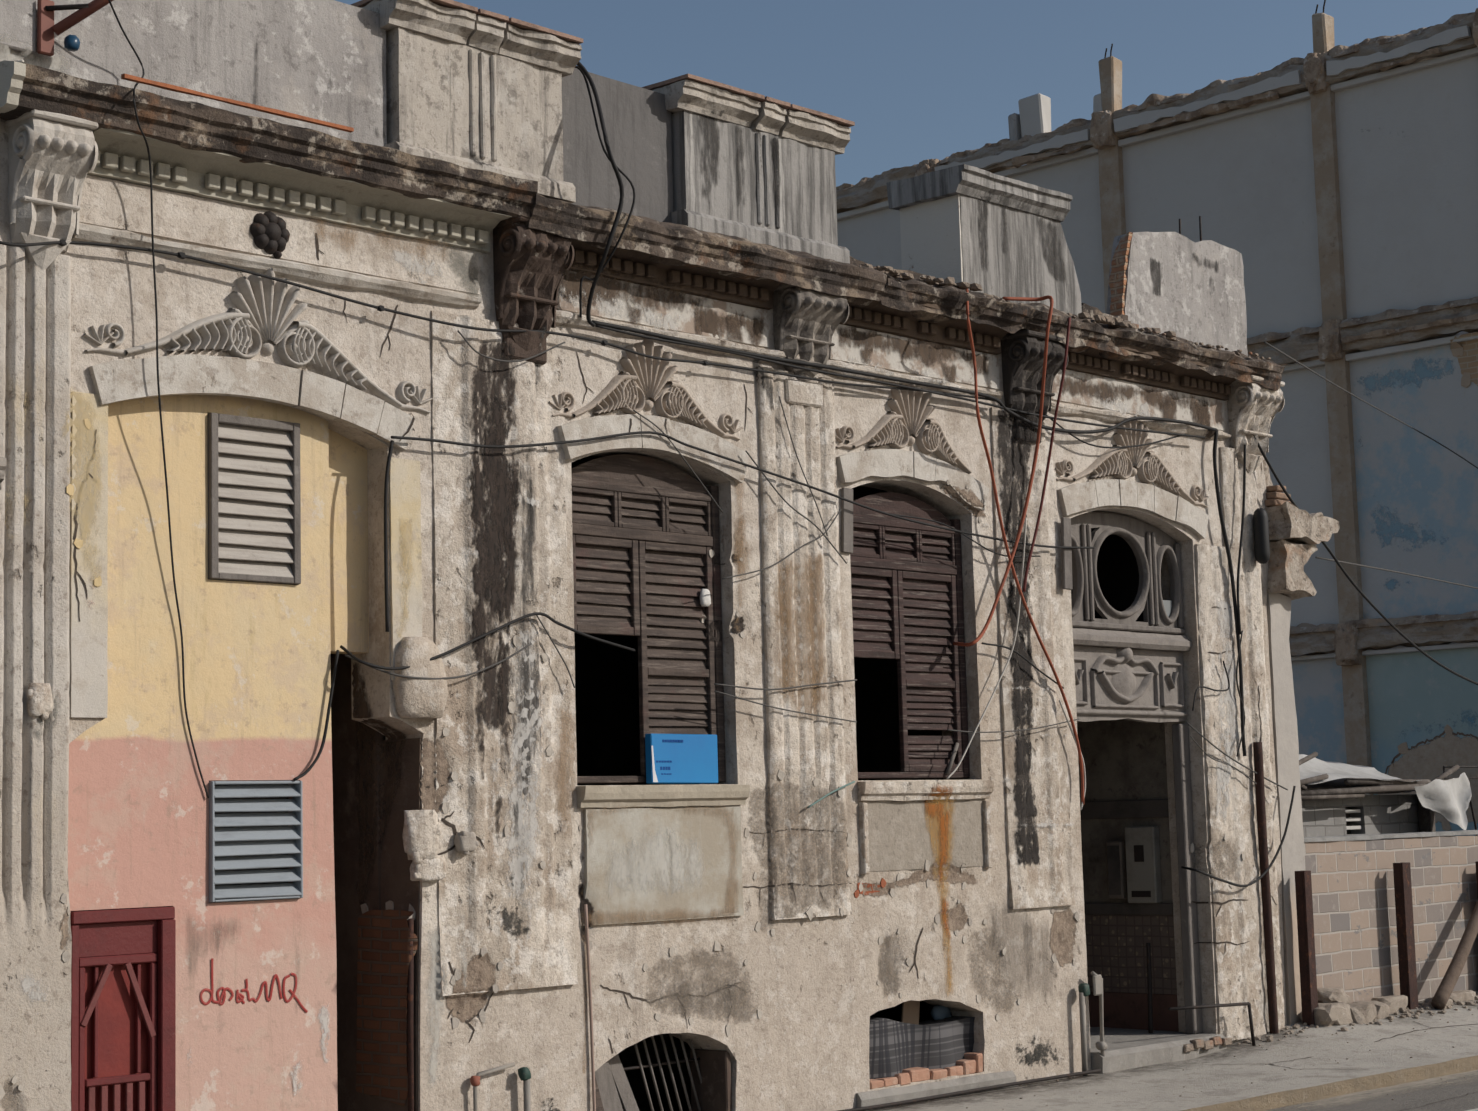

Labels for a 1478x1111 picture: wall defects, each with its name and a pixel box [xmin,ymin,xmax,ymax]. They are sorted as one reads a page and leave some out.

leakage [699,110,781,206]
leakage [559,264,774,409]
leakage [839,327,988,383]
leakage [978,197,1007,269]
leakage [1151,259,1161,296]
leakage [458,340,541,837]
leakage [983,407,1074,865]
flaking render [1378,724,1478,831]
flaking render [744,770,1021,1021]
corrosion [925,786,954,989]
flaking render [429,932,503,1082]
flaking render [643,941,763,1037]